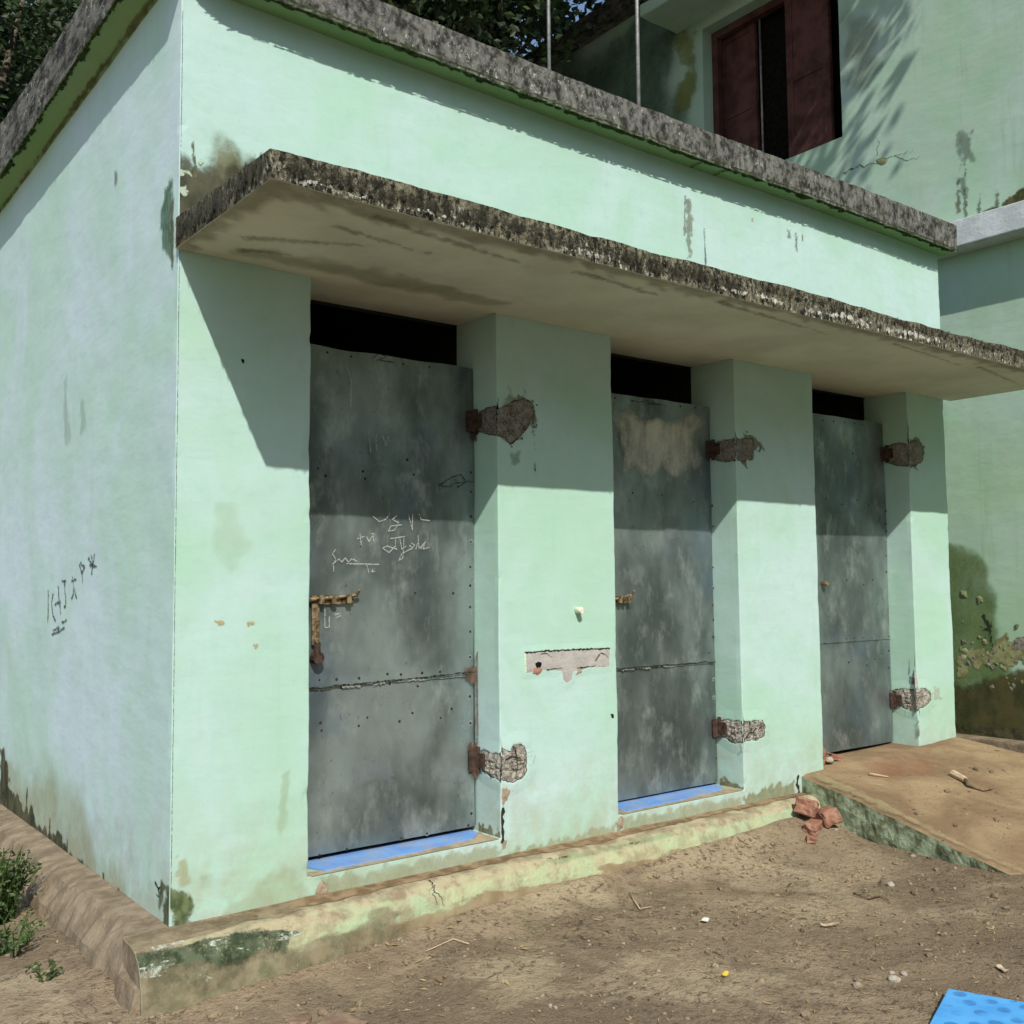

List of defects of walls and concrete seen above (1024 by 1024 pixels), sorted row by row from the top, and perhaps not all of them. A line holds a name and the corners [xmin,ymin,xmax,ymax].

crack [844,138,920,174]
leakage [170,141,262,268]
spalling [478,395,538,448]
spalling [715,431,765,467]
spalling [888,423,925,470]
flaking render [519,642,614,690]
spalling [891,655,940,736]
leakage [948,544,1024,741]
peeling [956,624,1024,691]
spalling [716,709,772,754]
leakage [0,747,83,864]
spalling [475,730,537,850]